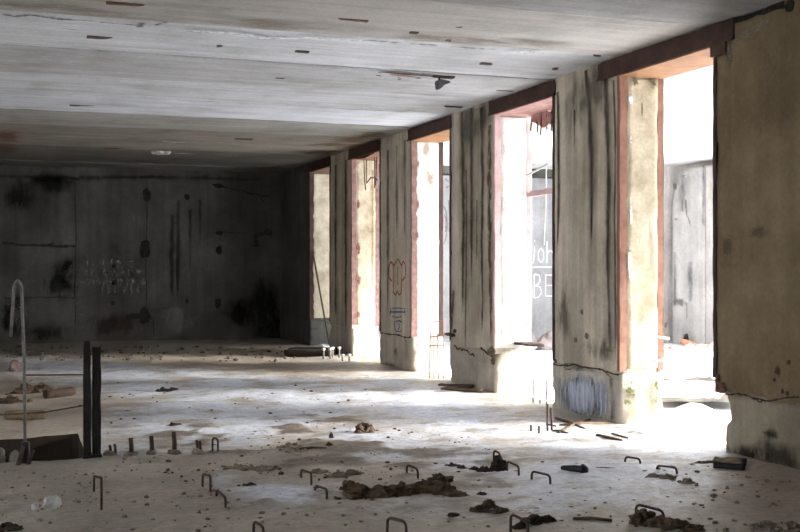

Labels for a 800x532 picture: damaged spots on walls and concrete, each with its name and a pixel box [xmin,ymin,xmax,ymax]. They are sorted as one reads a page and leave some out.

damp [7,174,175,206]
damp [387,140,405,302]
damp [572,69,616,356]
damp [50,261,73,297]
damp [560,299,568,331]
crack [455,346,489,357]
crack [553,363,619,378]
damp [560,365,613,418]
crack [725,393,799,403]